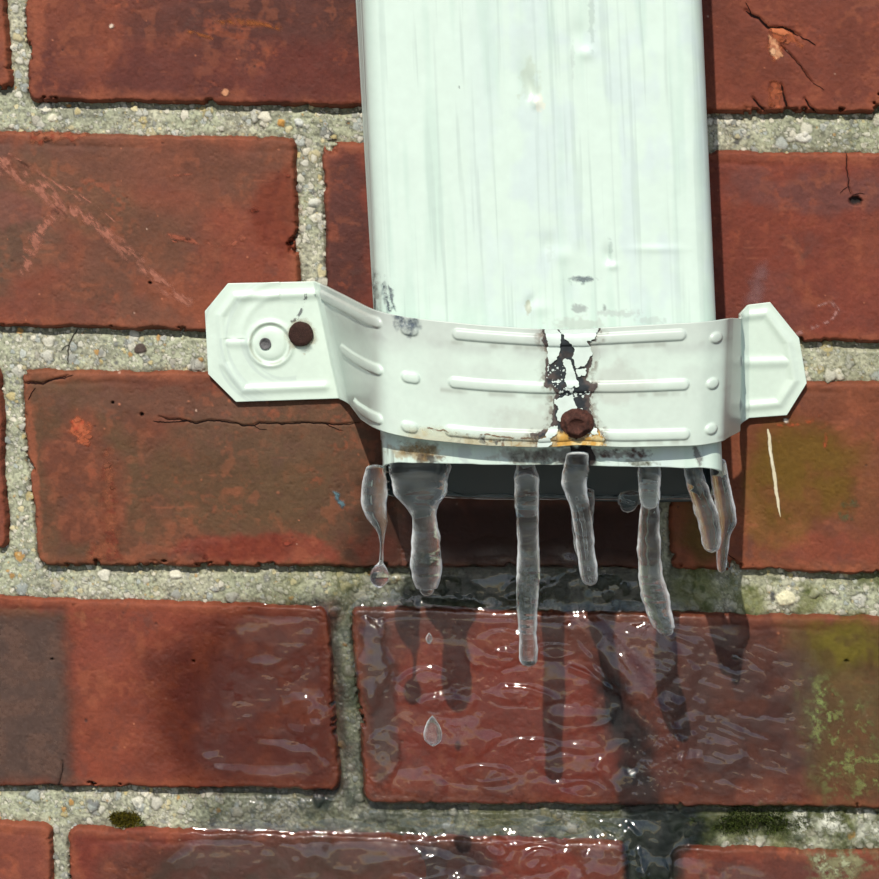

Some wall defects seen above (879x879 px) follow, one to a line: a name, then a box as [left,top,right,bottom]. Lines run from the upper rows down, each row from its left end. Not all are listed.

crack [745,2,824,112]
crack [840,152,863,195]
peeling [530,328,605,447]
crack [154,417,358,431]
corrosion [402,427,538,460]
corrosion [549,406,604,447]
water stain [402,569,517,607]
water stain [538,569,643,610]
water stain [685,640,804,788]
water stain [600,675,658,807]
water stain [412,846,491,879]
water stain [624,807,717,879]